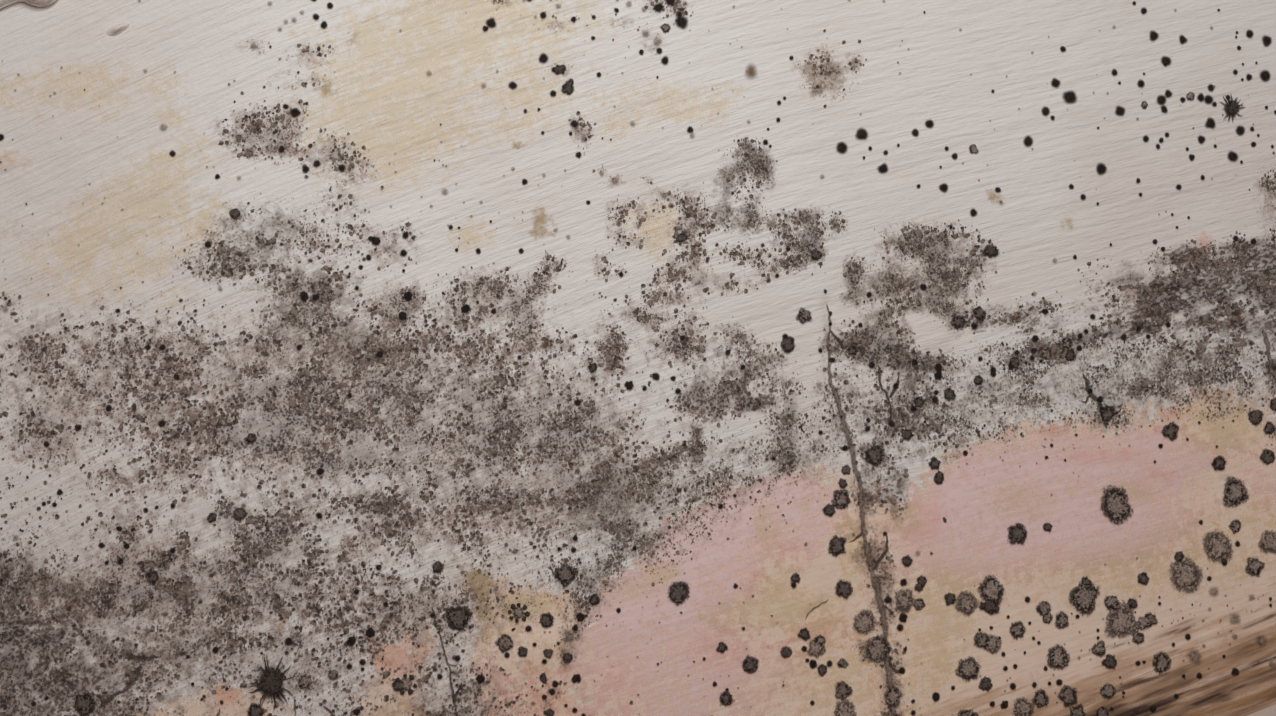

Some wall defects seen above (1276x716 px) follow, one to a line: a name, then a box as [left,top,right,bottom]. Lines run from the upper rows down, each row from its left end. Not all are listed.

water stain [279,0,333,31]
water stain [217,99,377,182]
water stain [539,53,574,96]
water stain [569,111,612,158]
water stain [789,40,867,107]
water stain [837,113,900,173]
water stain [1042,78,1076,120]
water stain [1097,72,1260,163]
water stain [1233,30,1271,81]
water stain [1069,163,1106,205]
water stain [796,308,812,323]
crack [827,305,899,716]